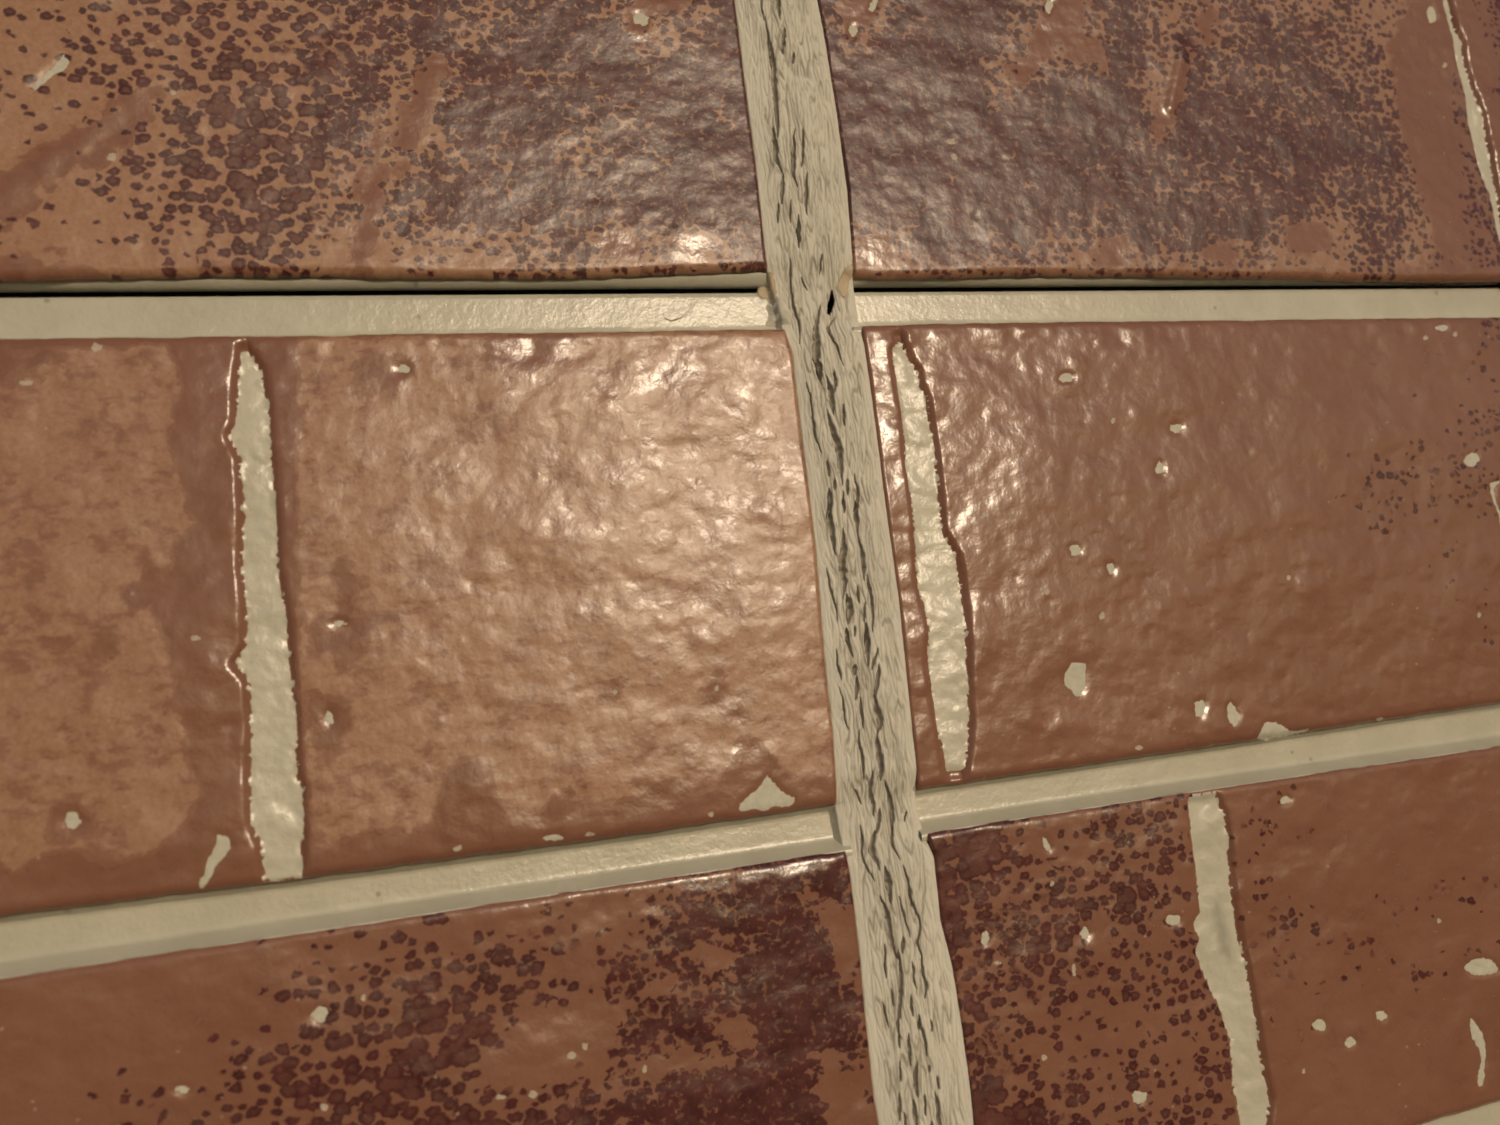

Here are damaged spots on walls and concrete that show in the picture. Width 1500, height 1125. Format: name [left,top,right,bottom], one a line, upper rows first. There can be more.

crack [760,0,942,1125]
peeling [1427,6,1436,23]